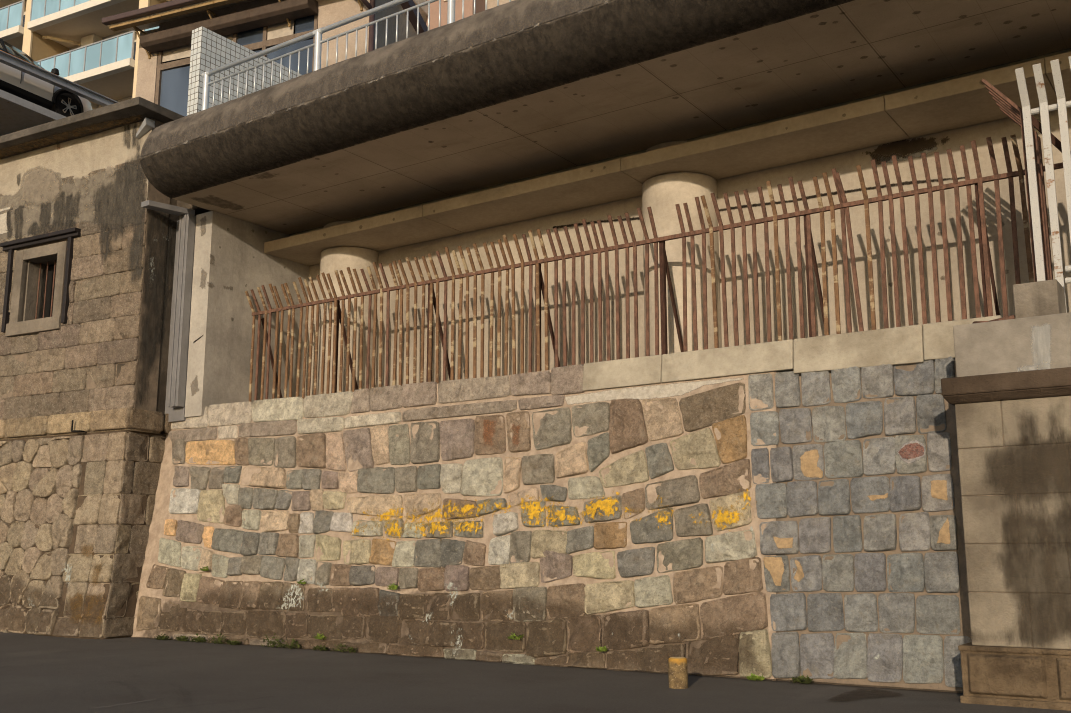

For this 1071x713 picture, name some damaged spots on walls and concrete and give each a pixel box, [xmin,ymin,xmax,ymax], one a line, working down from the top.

spalling [0,115,143,159]
damp [6,191,80,240]
flaking render [0,167,136,239]
damp [94,125,179,404]
damp [988,420,1071,643]